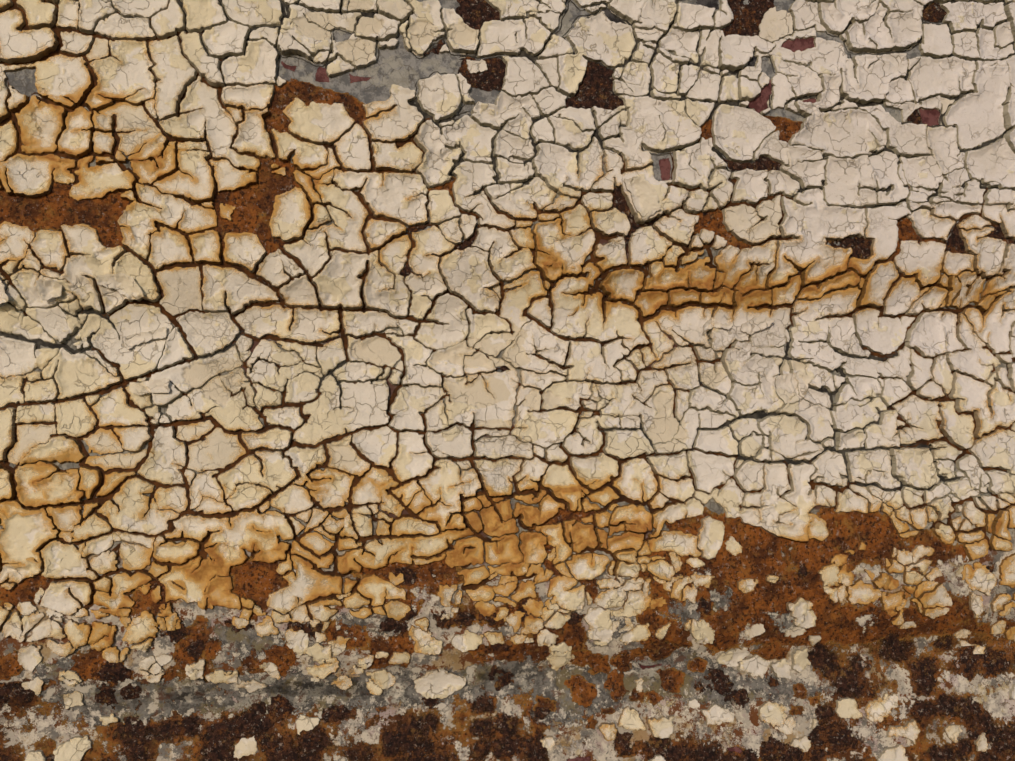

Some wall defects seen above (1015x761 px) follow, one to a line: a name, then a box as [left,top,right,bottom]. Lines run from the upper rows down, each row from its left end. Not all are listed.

crack [0,0,219,206]
rust [0,25,393,296]
crack [410,0,817,215]
crack [765,0,1012,69]
rust [494,185,1015,336]
crack [0,71,1015,619]
peeling [103,420,214,496]
peeling [0,579,95,657]
rust [0,400,1015,761]
peeling [489,514,608,671]
peeling [716,597,821,679]
peeling [835,692,921,761]